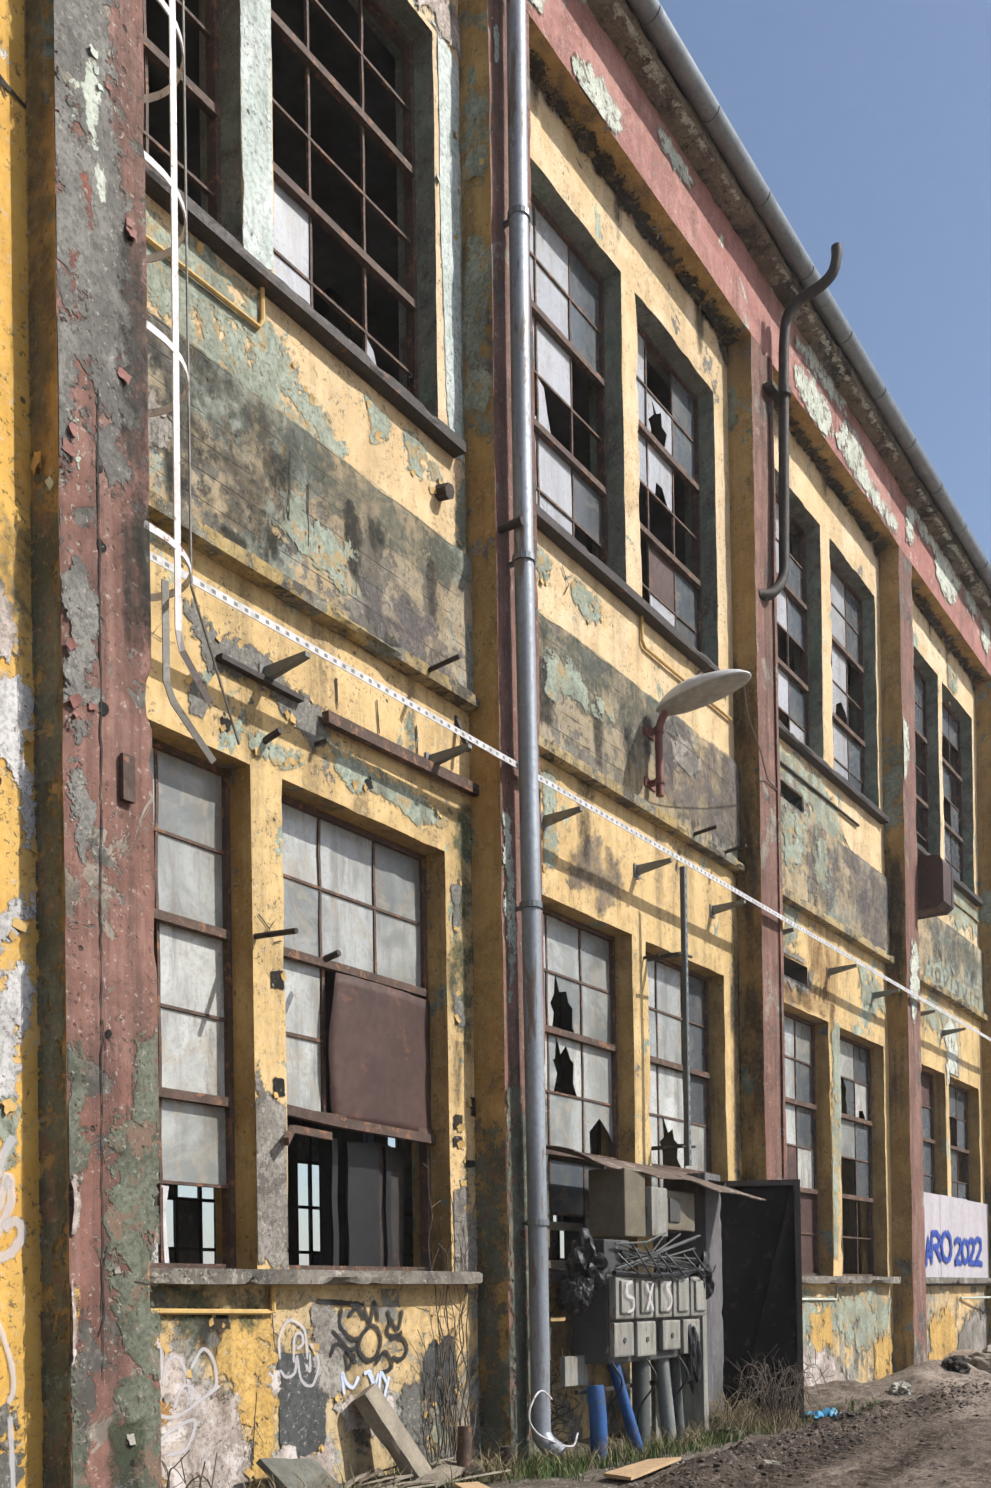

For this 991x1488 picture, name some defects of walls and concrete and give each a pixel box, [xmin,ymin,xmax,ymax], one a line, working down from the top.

peeling [571,51,623,134]
spalling [605,0,740,201]
leakage [120,236,460,683]
peeling [772,257,991,658]
peeling [0,0,173,1488]
peeling [183,597,449,831]
leakage [539,622,765,1181]
leakage [804,823,906,1001]
leakage [109,1421,142,1488]
spalling [150,1333,279,1488]
peeling [265,1368,282,1398]
spalling [270,1303,376,1480]